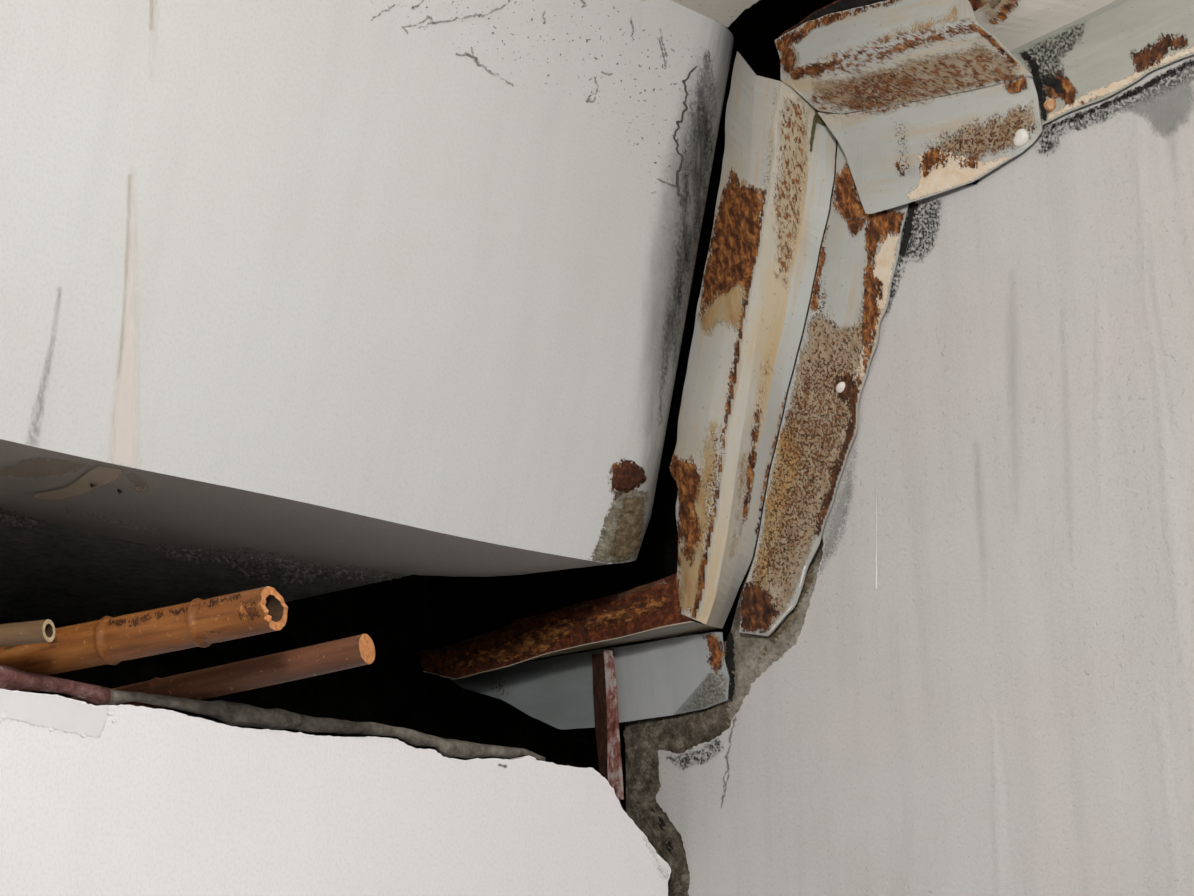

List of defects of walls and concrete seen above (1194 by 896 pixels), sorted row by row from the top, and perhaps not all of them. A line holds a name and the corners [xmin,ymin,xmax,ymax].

crack [658,40,697,205]
leakage [1039,59,1194,153]
corrosion [445,0,1097,675]
spalling [589,458,649,564]
peeling [0,689,116,738]
crack [721,716,736,807]